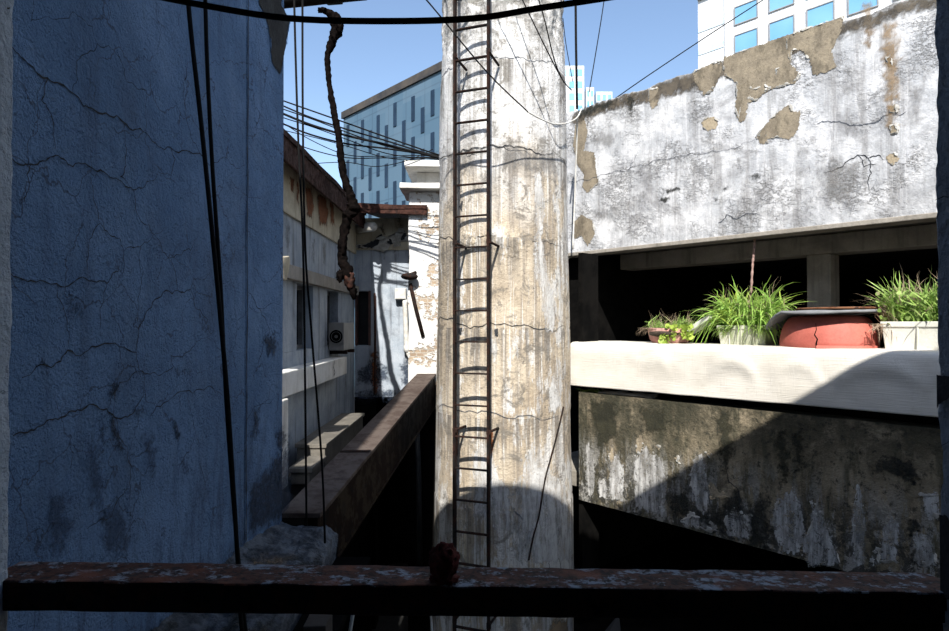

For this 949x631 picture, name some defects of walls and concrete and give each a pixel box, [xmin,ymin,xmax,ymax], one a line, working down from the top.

flaking render [259,0,290,74]
crack [439,144,561,159]
peeling [573,119,599,193]
water stain [572,72,699,123]
peeling [693,16,844,122]
peeling [755,104,801,144]
crack [826,154,882,190]
crack [817,111,907,126]
water stain [839,0,937,126]
crack [1,0,248,529]
water stain [590,402,618,447]
water stain [668,410,773,550]